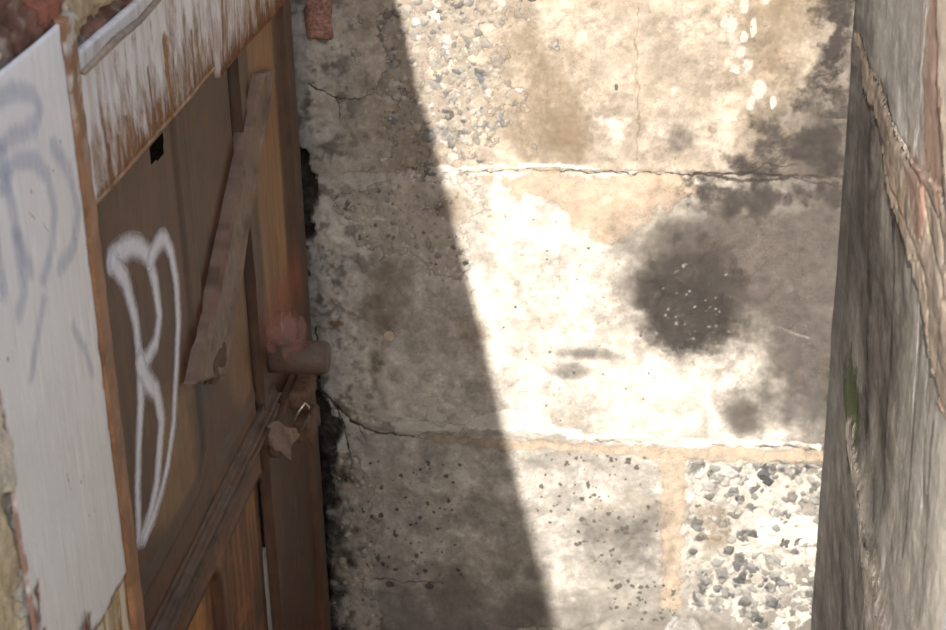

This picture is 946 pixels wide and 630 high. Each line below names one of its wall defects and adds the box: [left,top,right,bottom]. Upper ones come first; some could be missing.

peeling [720,0,757,74]
corrosion [92,0,287,198]
peeling [746,80,777,110]
spalling [300,147,317,237]
spalling [330,0,698,280]
crack [396,162,843,187]
leakage [636,0,855,432]
crack [712,443,824,451]
corrosion [82,580,123,630]